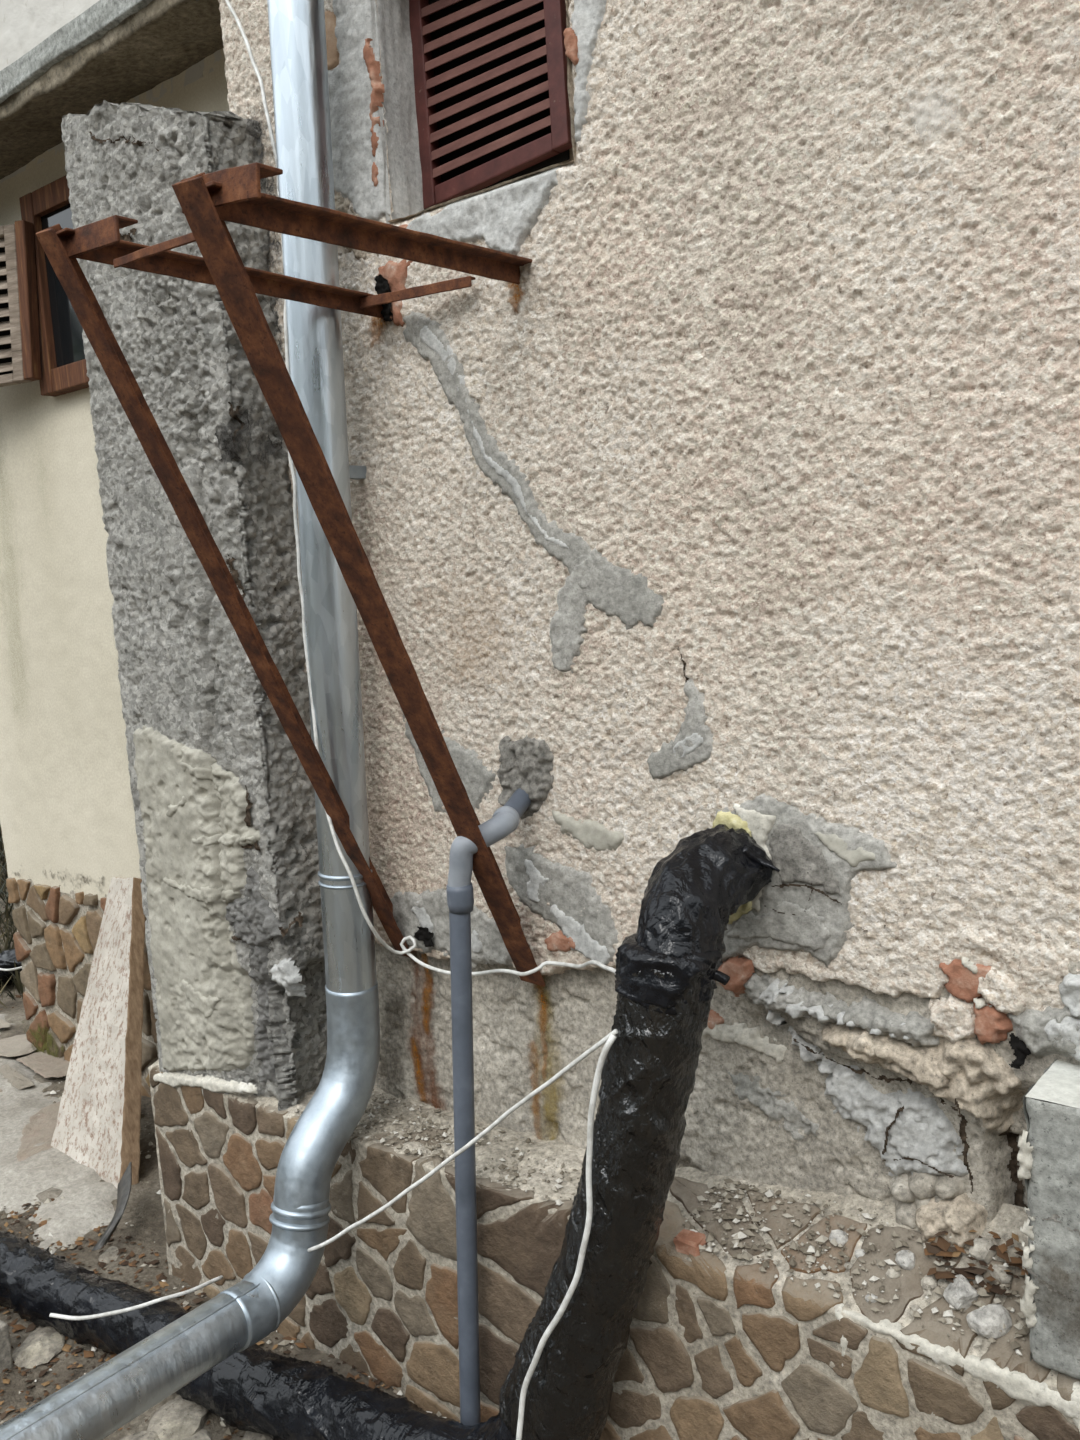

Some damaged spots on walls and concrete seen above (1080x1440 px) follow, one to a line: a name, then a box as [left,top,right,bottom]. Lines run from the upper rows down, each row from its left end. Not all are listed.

flaking render [325,11,339,70]
spalling [363,38,385,187]
flaking render [563,28,579,66]
flaking render [343,247,413,327]
corrosion [411,953,443,1110]
corrosion [532,985,559,1140]
flaking render [707,1010,724,1029]
flaking render [718,956,755,997]
crack [793,1038,973,1194]
spalling [821,926,1069,1221]